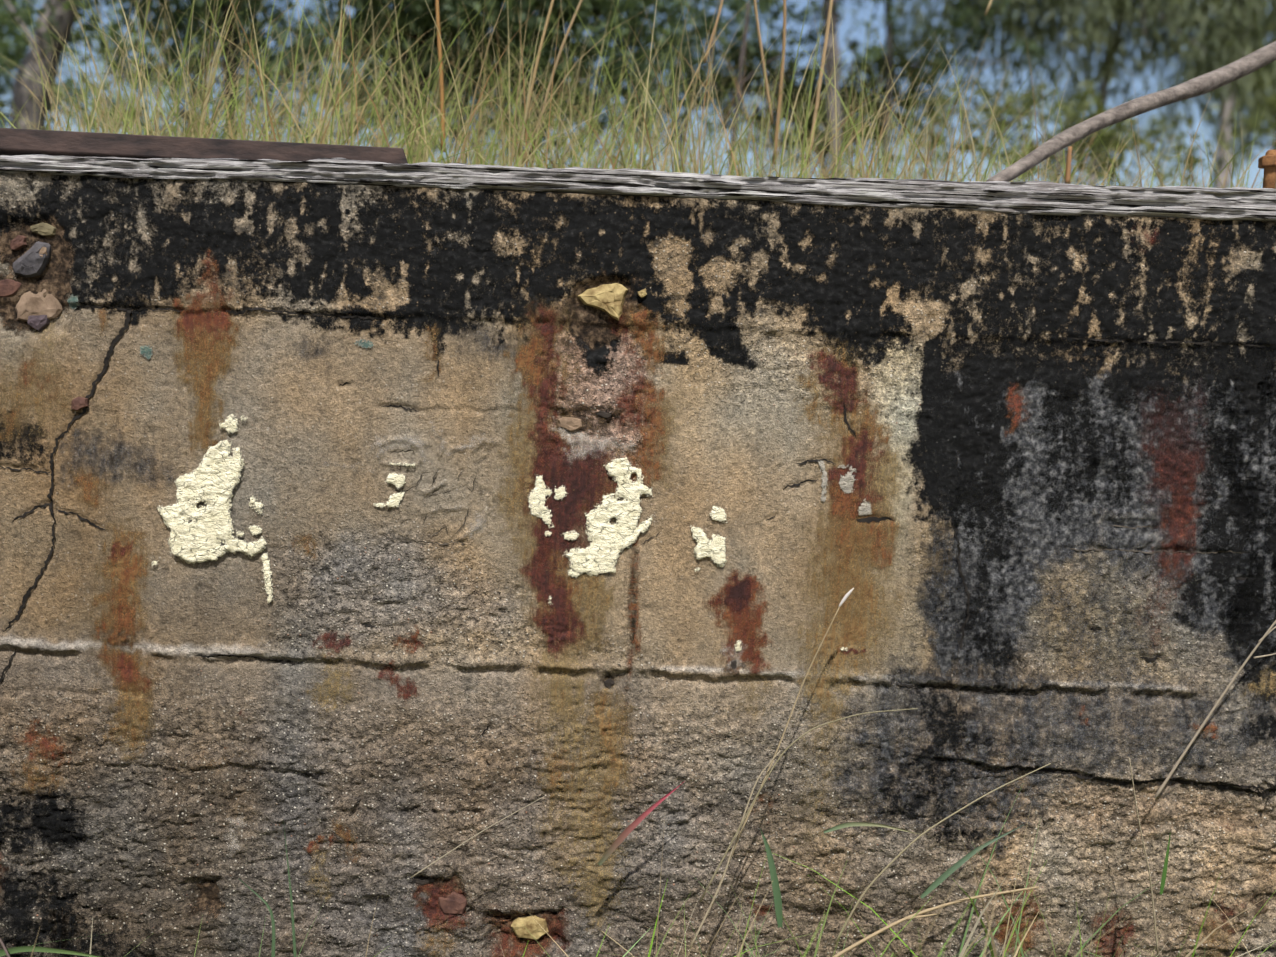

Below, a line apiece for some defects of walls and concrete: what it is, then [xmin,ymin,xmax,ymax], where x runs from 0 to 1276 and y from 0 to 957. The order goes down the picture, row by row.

rust [172,251,238,451]
crack [0,301,183,683]
peeling [219,414,248,434]
crack [195,654,299,664]
peeling [236,495,264,538]
peeling [260,553,274,604]
peeling [527,474,579,541]
rust [499,304,675,930]
leakage [0,172,1276,858]
rust [708,570,770,715]
rust [798,347,902,837]
crack [1004,767,1276,799]